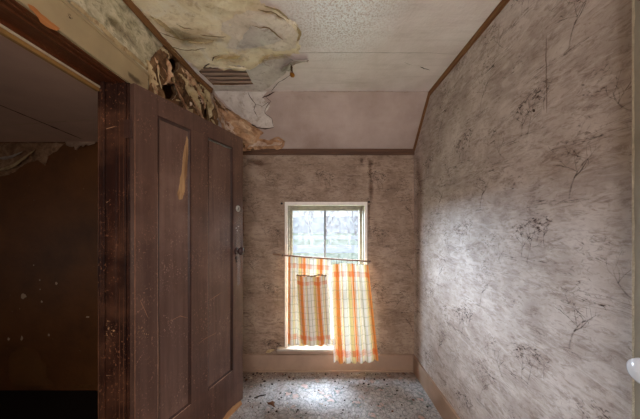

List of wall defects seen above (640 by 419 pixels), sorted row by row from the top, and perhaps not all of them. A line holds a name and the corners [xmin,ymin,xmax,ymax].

flaking render [146,45,309,133]
crack [542,41,550,110]
peeling [0,141,97,176]